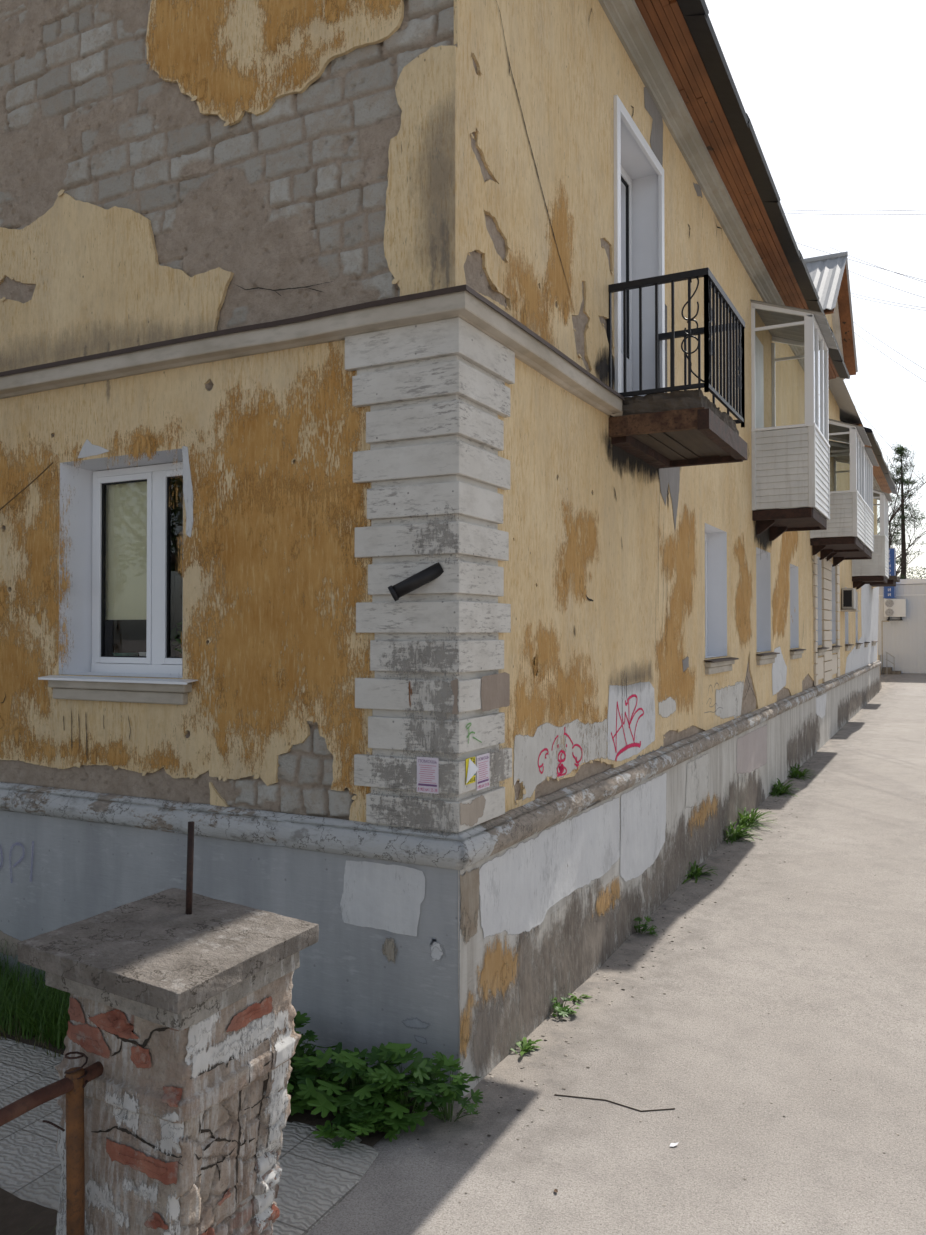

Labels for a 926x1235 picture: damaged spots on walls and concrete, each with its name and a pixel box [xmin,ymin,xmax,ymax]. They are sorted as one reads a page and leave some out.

spalling [0,0,457,331]
crack [496,1,574,310]
peeling [464,180,615,371]
peeling [0,342,611,839]
peeling [656,505,696,712]
peeling [772,531,798,640]
damp [785,717,821,772]
damp [838,680,882,730]
peeling [460,868,480,942]
damp [463,769,765,1082]
crack [88,1015,170,1056]
crack [92,1038,273,1207]